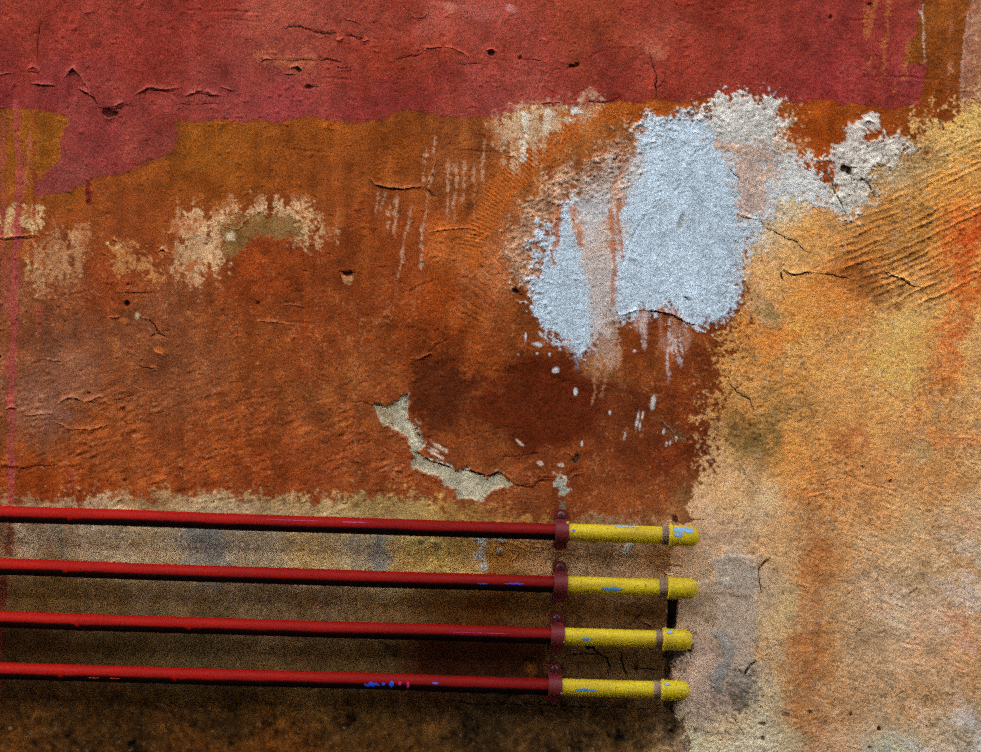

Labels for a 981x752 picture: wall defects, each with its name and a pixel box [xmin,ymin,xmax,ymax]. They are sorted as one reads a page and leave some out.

peeling [25,20,234,123]
damp [0,97,120,506]
spalling [0,182,343,314]
crack [884,270,924,288]
spalling [353,391,516,503]